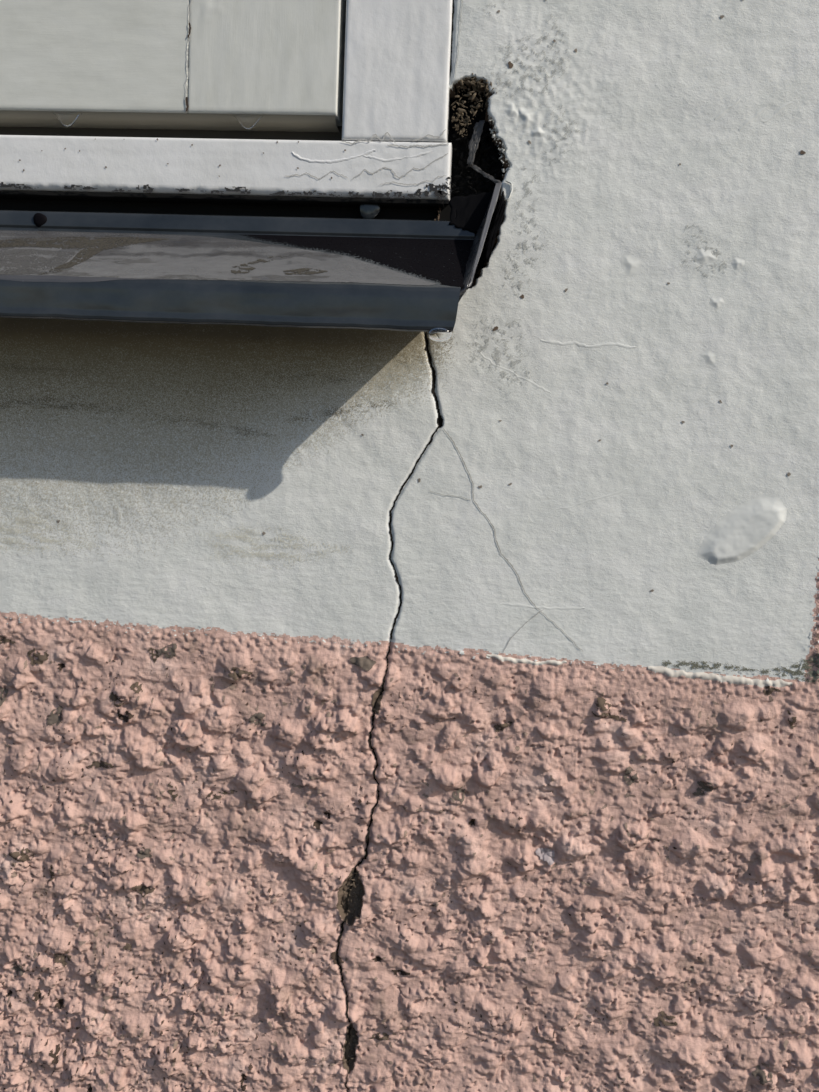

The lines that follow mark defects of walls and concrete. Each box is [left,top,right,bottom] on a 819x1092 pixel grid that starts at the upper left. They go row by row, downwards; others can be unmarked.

crack [335,333,583,1090]